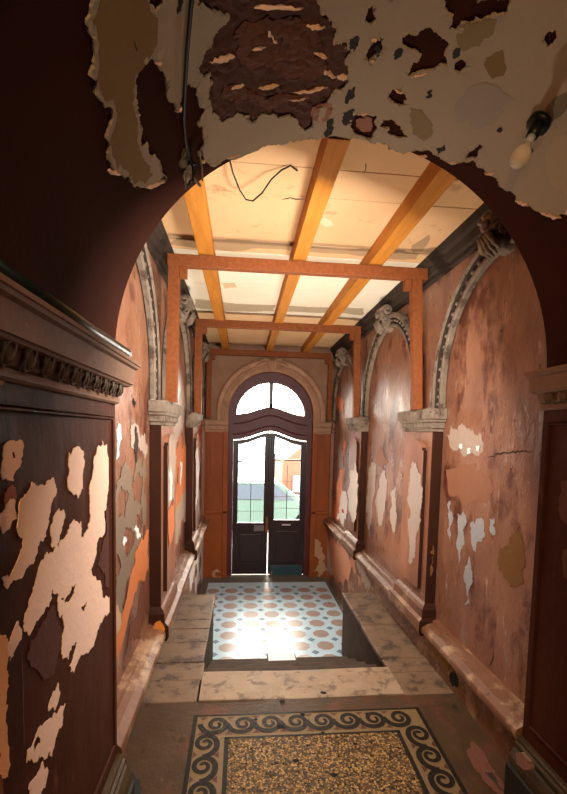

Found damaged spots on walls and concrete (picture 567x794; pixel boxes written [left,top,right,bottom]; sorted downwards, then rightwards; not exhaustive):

spalling [199,0,373,138]
spalling [179,148,192,184]
peeling [168,388,202,548]
flaking render [0,426,150,794]